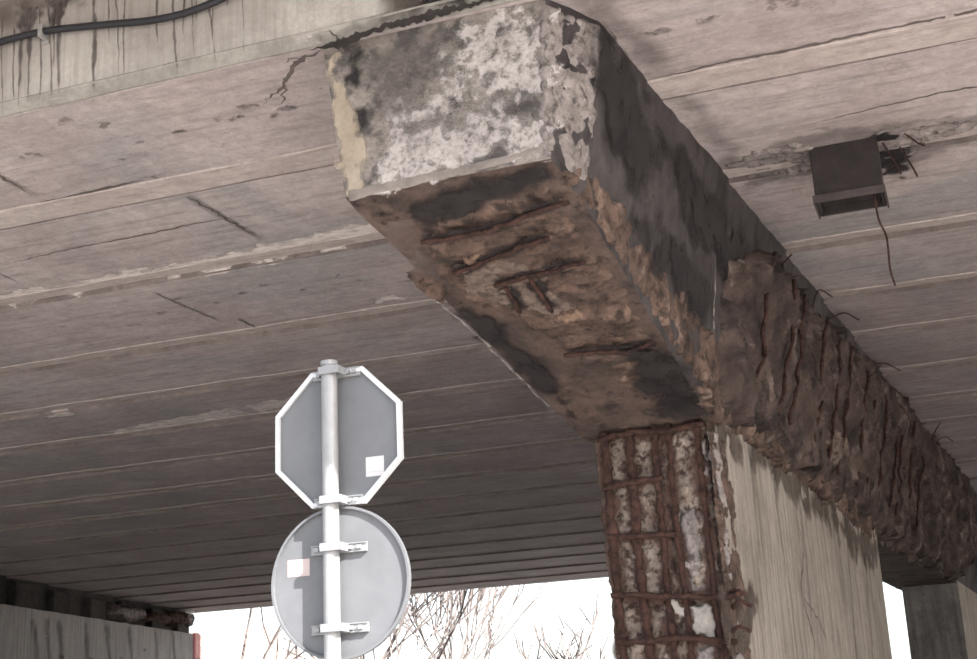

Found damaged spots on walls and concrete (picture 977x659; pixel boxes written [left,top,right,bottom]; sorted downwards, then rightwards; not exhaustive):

leakage [1,0,68,98]
leakage [92,0,125,81]
leakage [344,49,362,87]
crack [265,0,493,107]
leakage [390,0,465,13]
crack [649,9,977,80]
leakage [353,109,372,128]
crack [0,175,143,224]
crack [1,197,261,283]
spalling [327,4,977,659]
spalling [105,603,195,628]
rust [720,583,758,659]